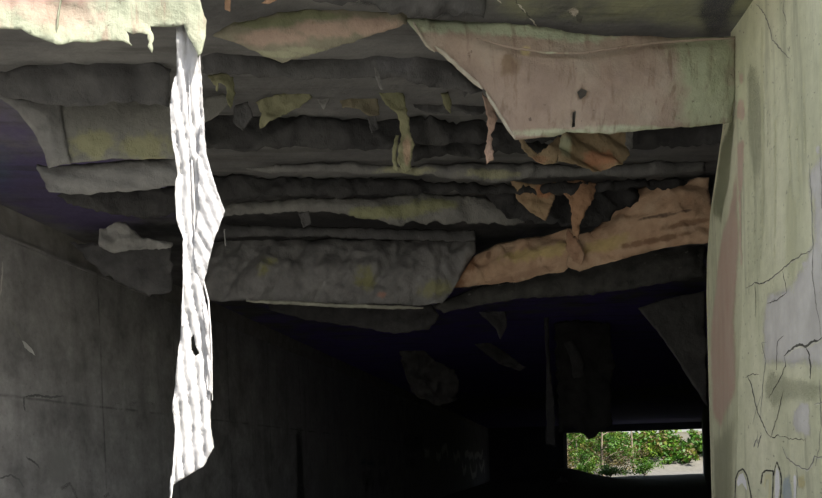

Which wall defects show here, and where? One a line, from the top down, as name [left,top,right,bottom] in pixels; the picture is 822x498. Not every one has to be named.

crack [809,158,822,212]
crack [745,235,822,489]